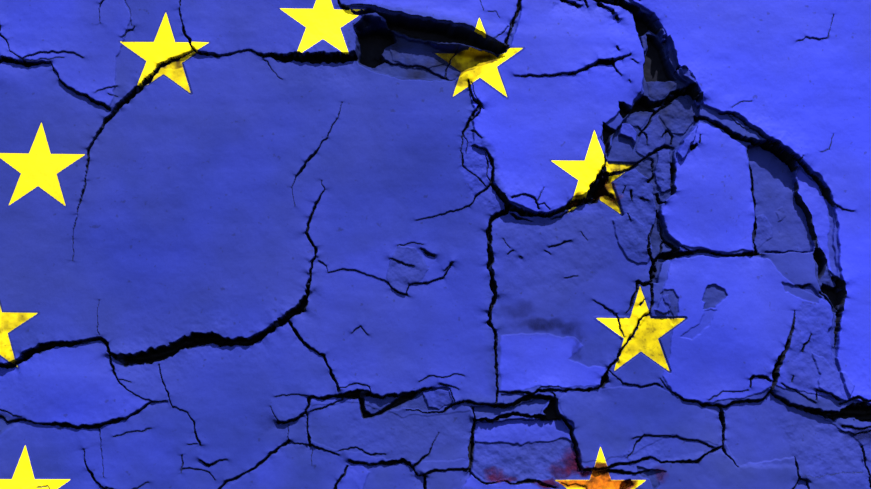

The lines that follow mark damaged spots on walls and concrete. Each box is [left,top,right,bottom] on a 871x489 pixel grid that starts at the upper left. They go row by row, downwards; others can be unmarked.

crack [381,47,459,81]
peeling [350,8,510,81]
crack [480,0,522,50]
crack [519,53,632,78]
crack [560,0,659,22]
crack [0,0,358,261]
spalling [602,12,704,319]
peeling [747,146,839,313]
crack [334,79,871,489]
peeling [702,285,728,309]
crack [0,180,454,489]
rust [537,453,636,489]